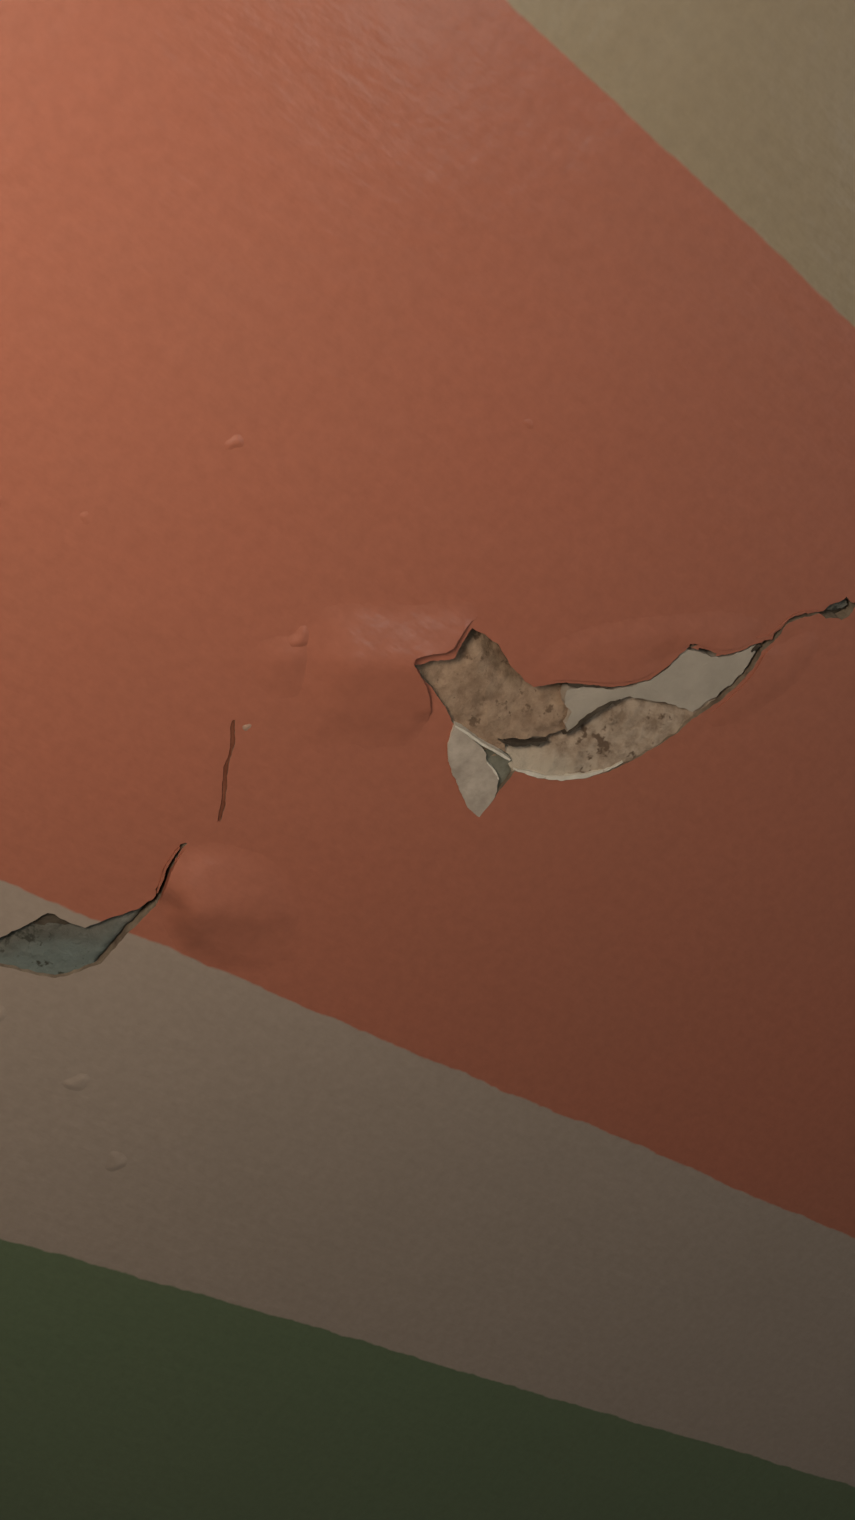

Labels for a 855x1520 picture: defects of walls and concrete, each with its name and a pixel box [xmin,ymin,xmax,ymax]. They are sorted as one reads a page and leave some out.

crack [757,598,848,639]
crack [218,720,235,821]
spalling [416,628,761,817]
spalling [0,901,149,975]